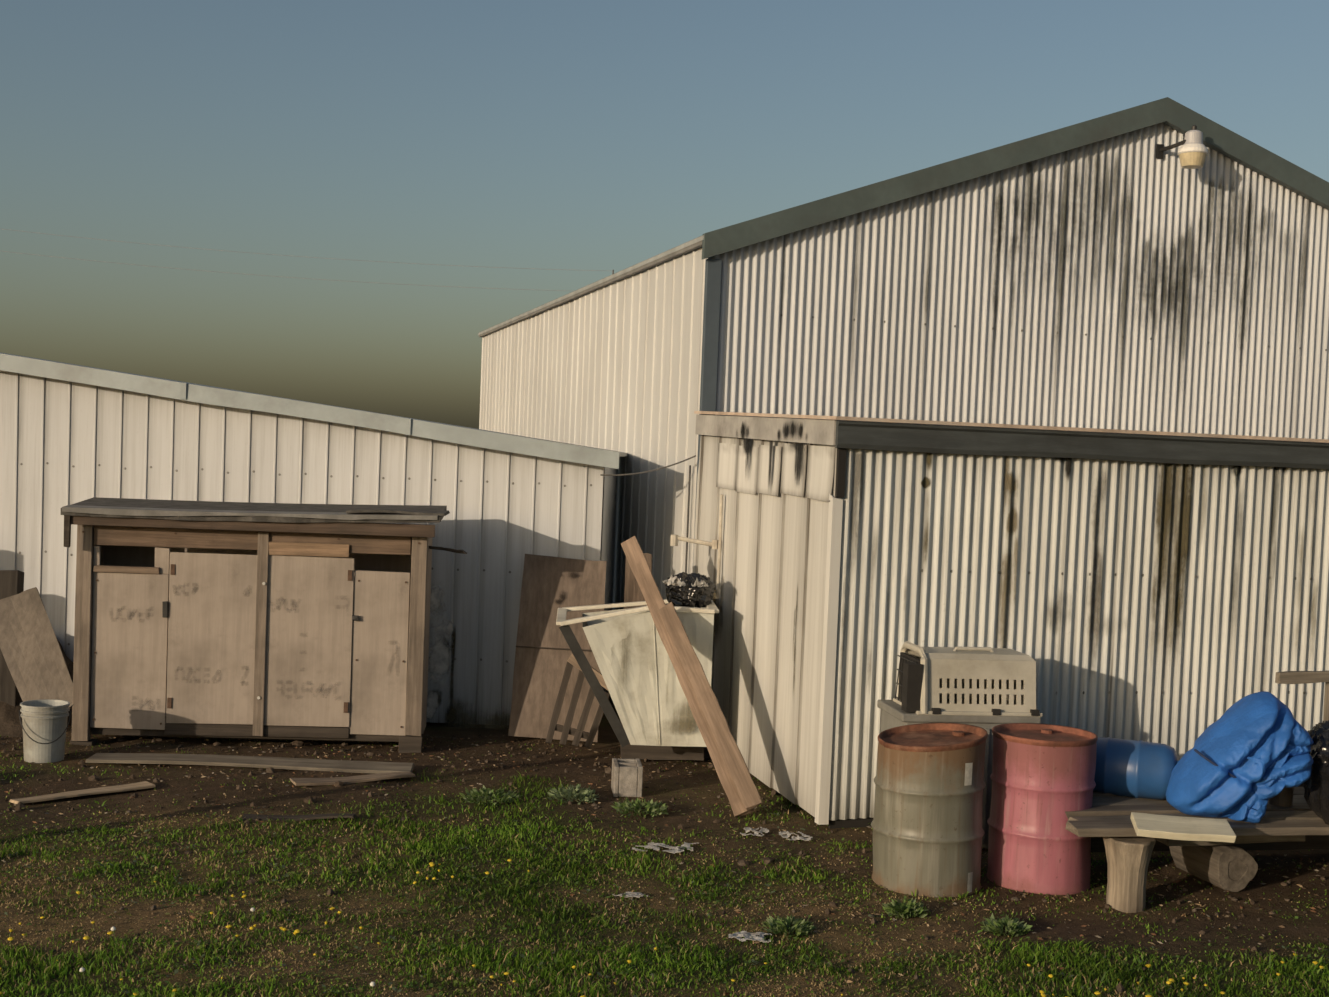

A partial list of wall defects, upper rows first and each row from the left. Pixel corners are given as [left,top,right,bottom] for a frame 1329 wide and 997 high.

damp [1027,162,1075,315]
damp [1088,158,1131,344]
damp [1144,183,1231,350]
damp [1241,197,1252,346]
damp [1002,461,1018,641]
damp [1091,479,1106,638]
damp [1153,463,1193,643]